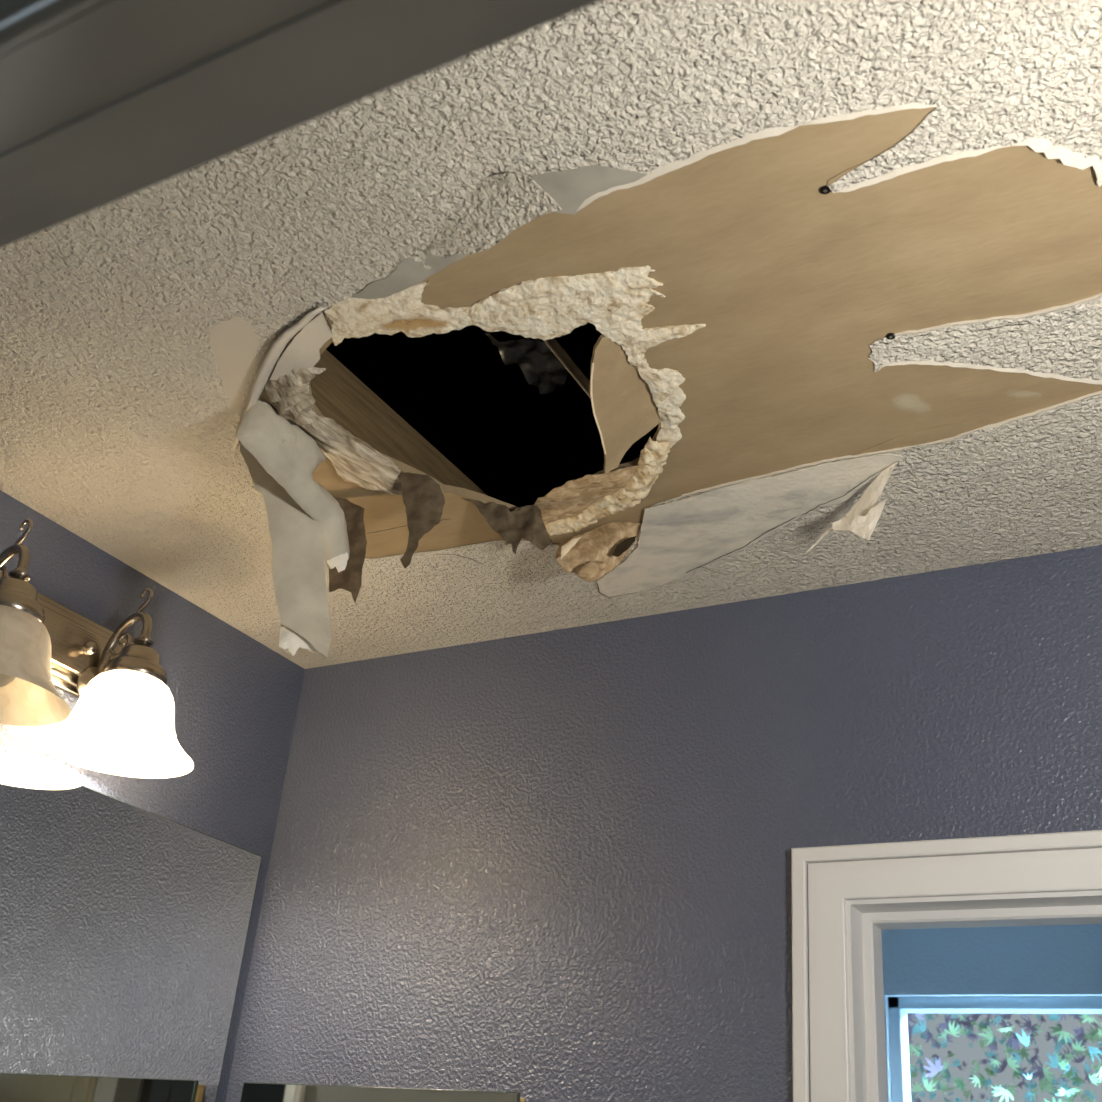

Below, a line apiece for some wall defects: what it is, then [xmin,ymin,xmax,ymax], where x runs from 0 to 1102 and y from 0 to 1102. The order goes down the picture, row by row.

peeling [352,248,469,299]
peeling [596,453,903,597]
peeling [490,543,566,576]